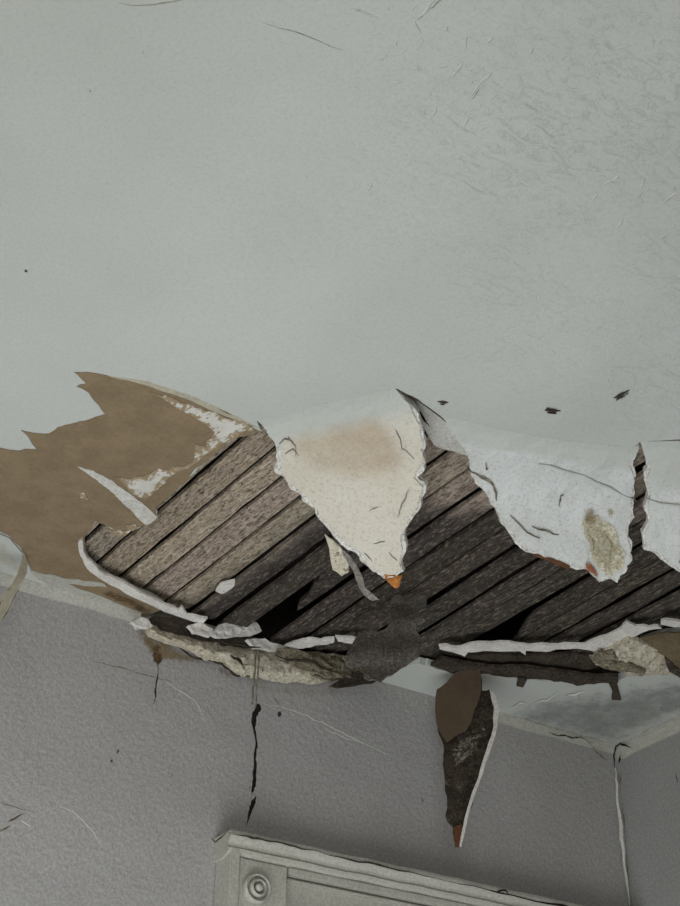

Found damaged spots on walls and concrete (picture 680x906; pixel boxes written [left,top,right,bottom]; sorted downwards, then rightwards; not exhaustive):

flaking render [399,390,467,456]
crack [469,463,498,501]
crack [539,463,680,507]
peeling [0,372,362,684]
crack [513,518,559,539]
flaking render [589,636,671,677]
crack [211,650,567,906]
crack [549,732,631,785]